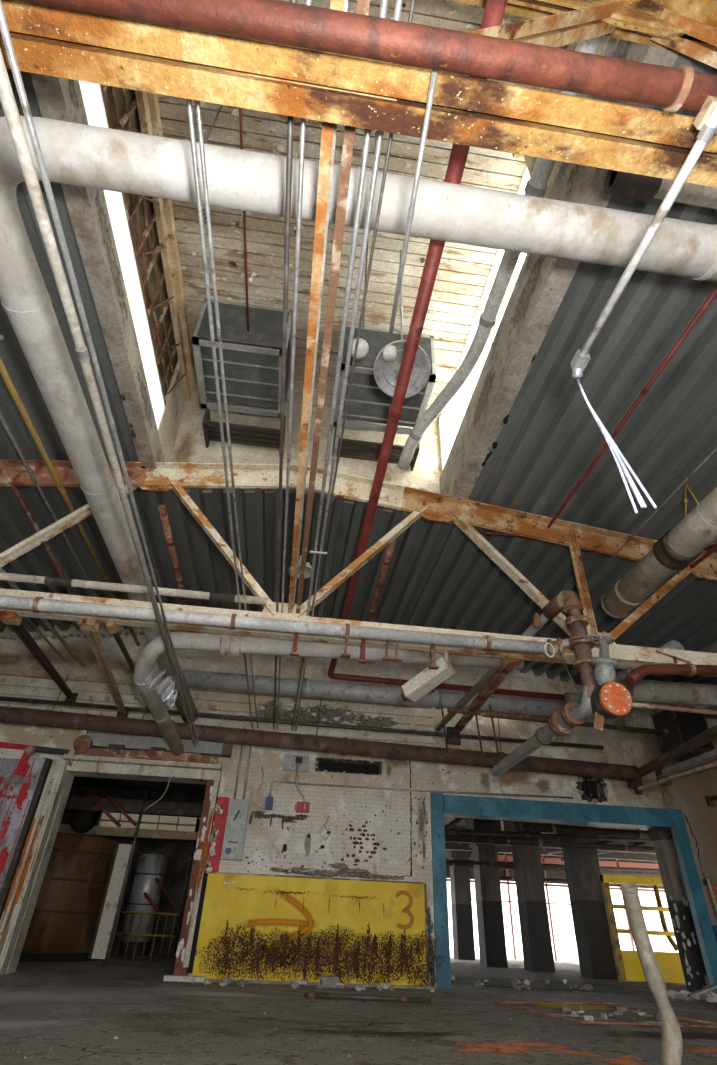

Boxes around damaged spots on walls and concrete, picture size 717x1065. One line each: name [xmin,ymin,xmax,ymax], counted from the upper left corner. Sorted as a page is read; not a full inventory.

rust [16,0,717,113]
leakage [257,701,397,727]
peeling [0,762,30,875]
peeling [194,786,236,885]
spalling [316,805,395,870]
spalling [574,776,609,804]
peeling [0,905,12,956]
peeling [176,939,185,963]